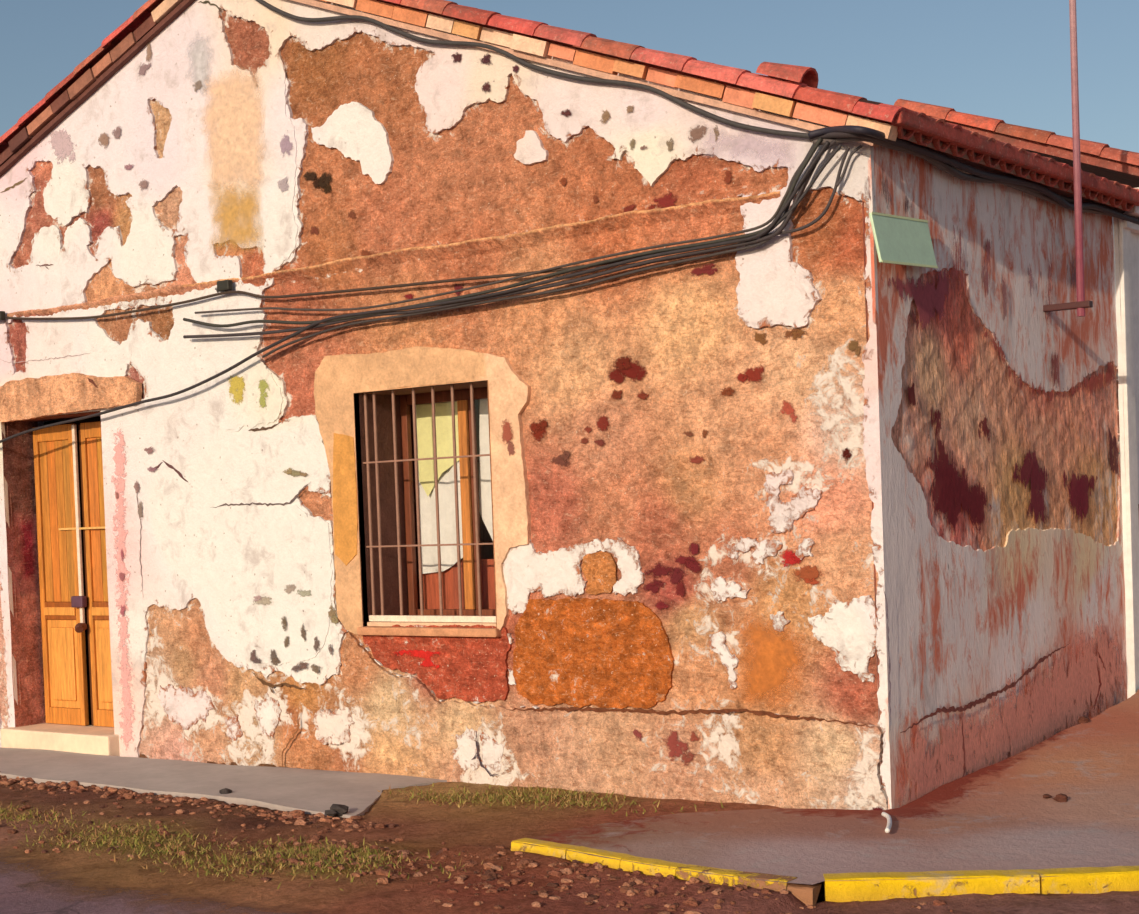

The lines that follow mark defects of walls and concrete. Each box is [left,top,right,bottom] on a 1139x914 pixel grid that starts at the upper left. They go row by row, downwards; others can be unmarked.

spalling [98,127,121,149]
peeling [11,161,148,269]
peeling [85,186,197,344]
crack [210,484,308,508]
peeling [139,9,888,810]
water stain [924,405,992,535]
water stain [1013,449,1049,525]
water stain [1063,468,1098,525]
water stain [1109,429,1118,474]
crack [506,592,1069,777]
water stain [898,623,1126,804]
crack [1093,652,1106,712]